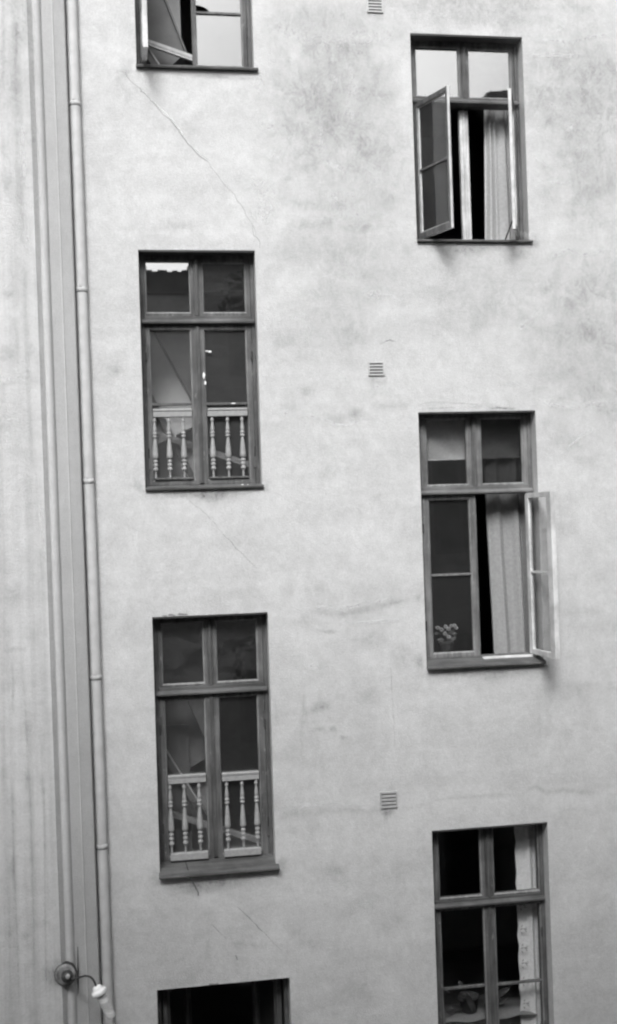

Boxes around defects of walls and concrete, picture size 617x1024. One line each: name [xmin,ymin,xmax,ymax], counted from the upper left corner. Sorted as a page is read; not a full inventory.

crack [126,75,260,242]